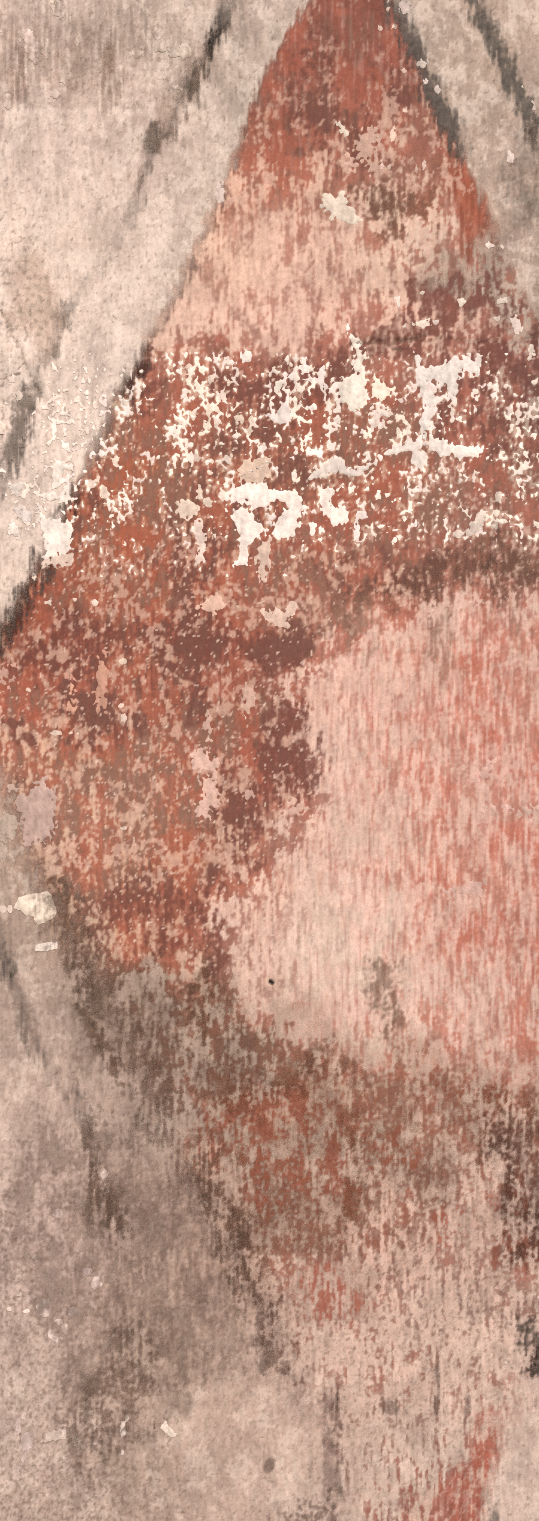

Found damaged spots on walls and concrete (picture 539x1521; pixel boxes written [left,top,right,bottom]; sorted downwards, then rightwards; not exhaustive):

peeling [0,296,539,583]
peeling [194,592,227,617]
spalling [0,891,56,925]
water stain [518,1318,539,1376]